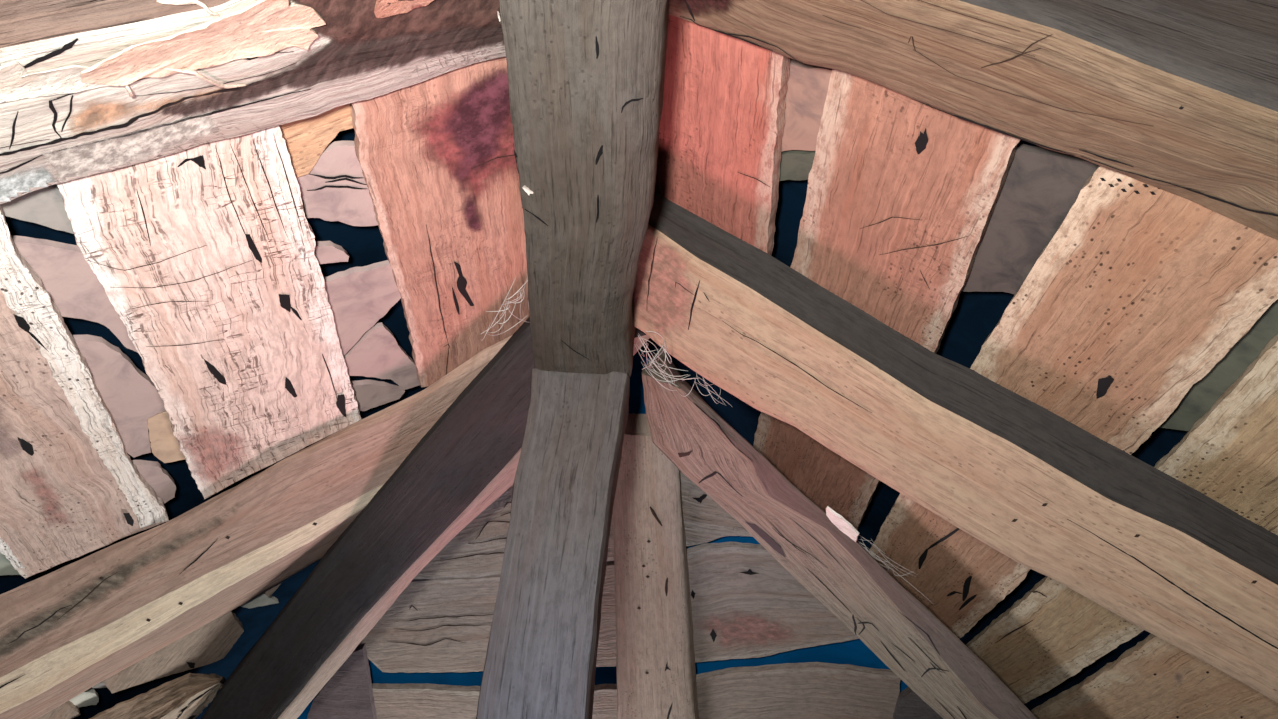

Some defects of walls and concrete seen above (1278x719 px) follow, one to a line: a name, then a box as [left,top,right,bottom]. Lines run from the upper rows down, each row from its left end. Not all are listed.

crack [24,39,79,68]
crack [0,51,310,174]
crack [88,136,367,309]
water stain [0,0,505,202]
water stain [422,71,516,231]